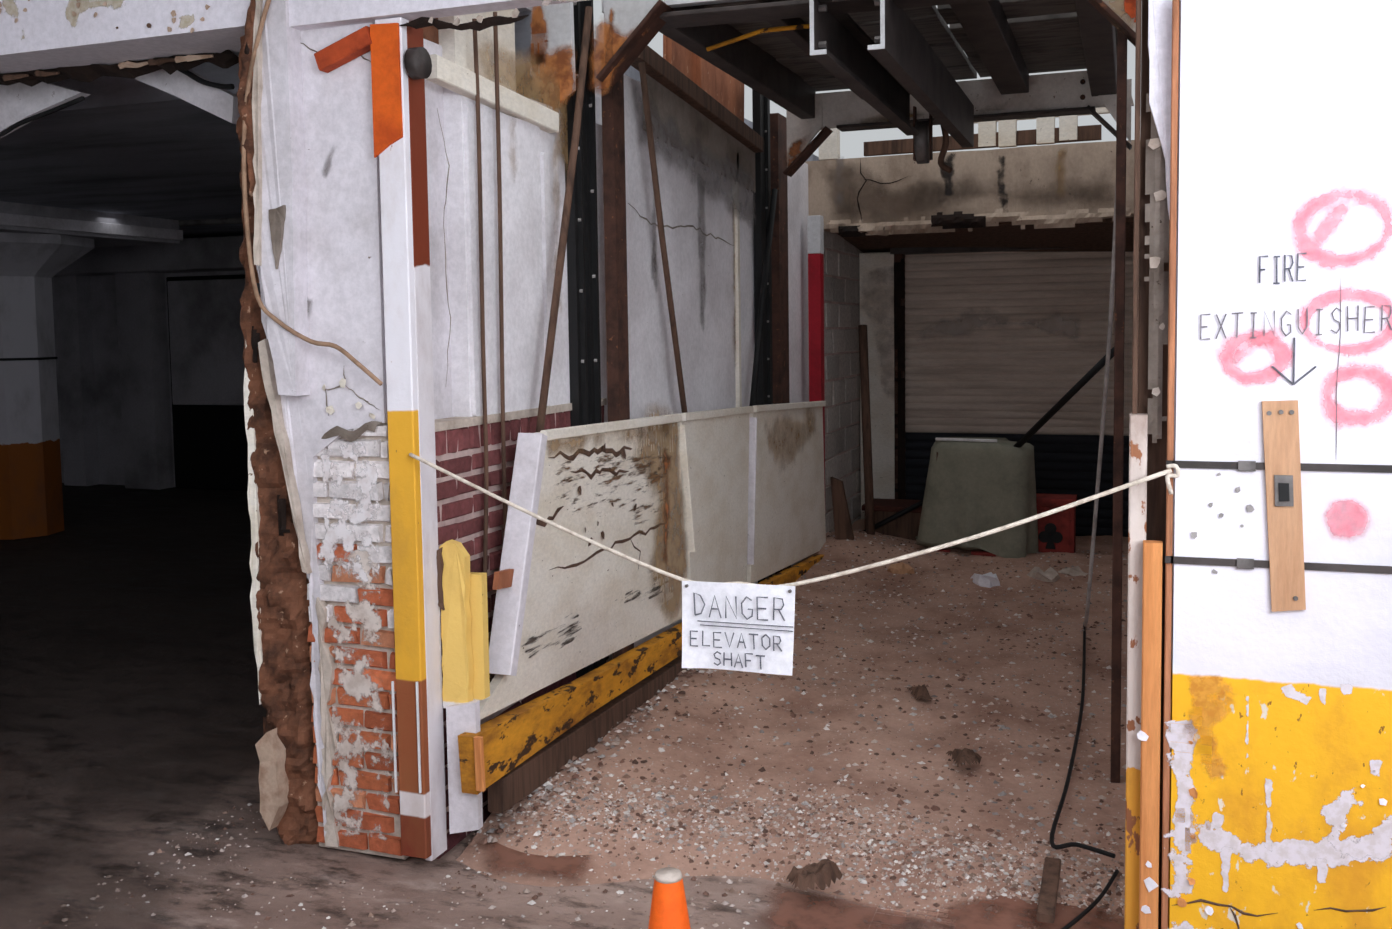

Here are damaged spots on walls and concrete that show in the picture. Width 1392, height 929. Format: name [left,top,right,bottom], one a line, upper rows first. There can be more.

flaking render [826,93,1169,443]
flaking render [0,0,409,860]
crack [536,506,564,527]
crack [550,516,673,570]
water stain [550,409,687,614]
peeling [1137,677,1392,929]
crack [1172,899,1275,929]
crack [1317,905,1385,913]